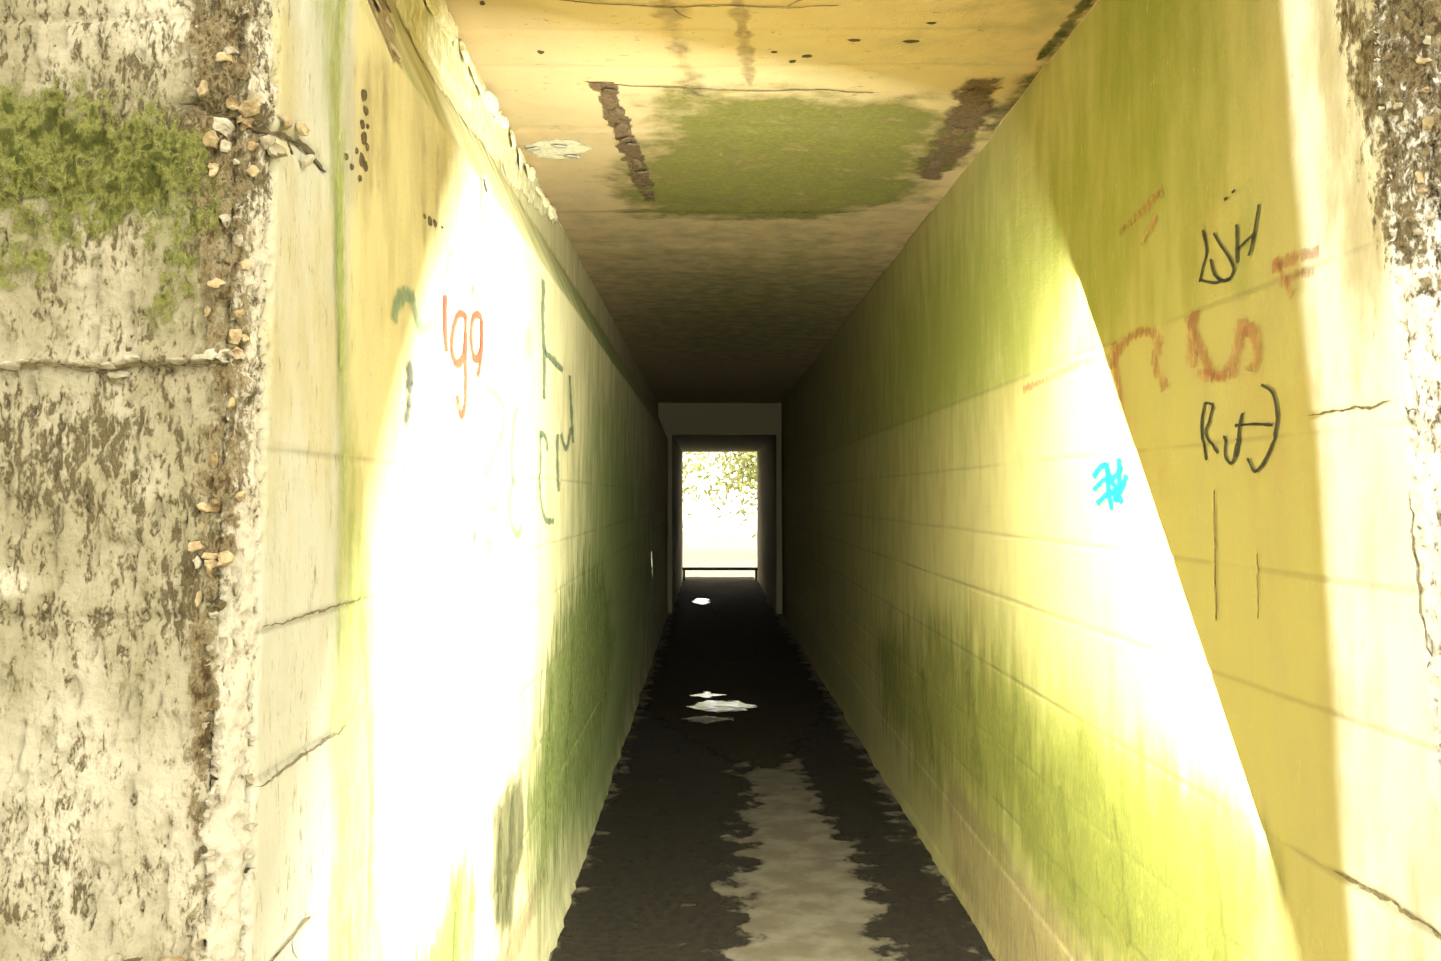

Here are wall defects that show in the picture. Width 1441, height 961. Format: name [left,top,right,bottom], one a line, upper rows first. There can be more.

spalling [589,82,656,201]
spalling [915,78,1001,180]
spalling [1336,0,1441,294]
crack [0,353,224,385]
leakage [546,577,1027,961]
leakage [493,780,536,931]
crack [107,953,184,961]